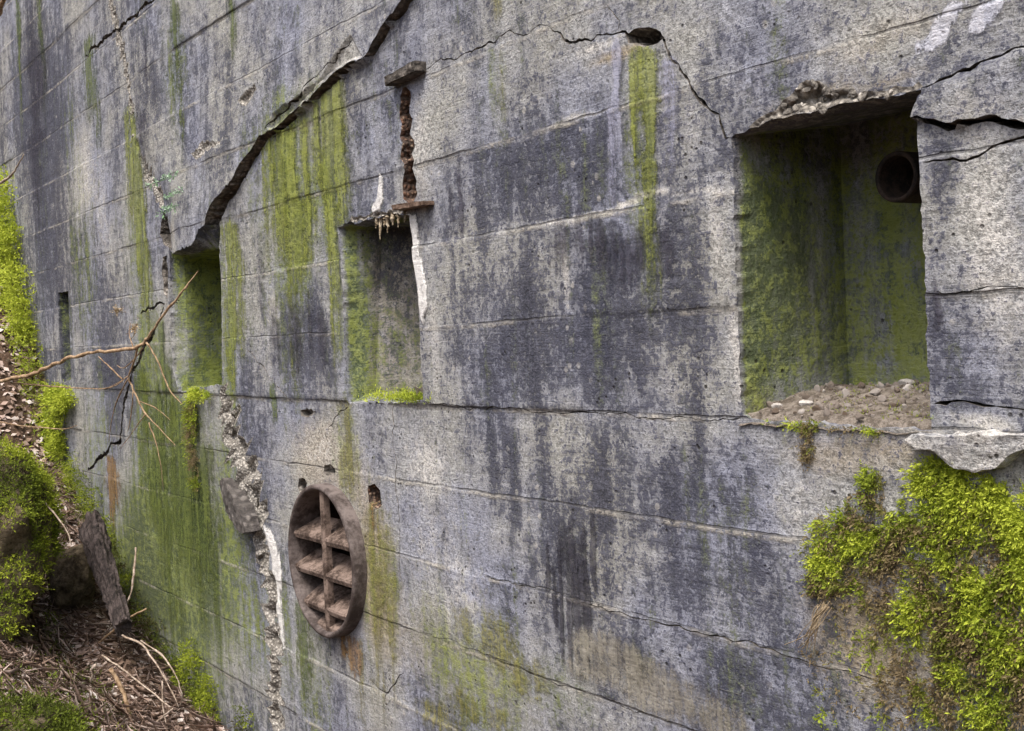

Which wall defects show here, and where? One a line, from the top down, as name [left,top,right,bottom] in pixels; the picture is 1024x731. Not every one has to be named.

crack [427,6,628,69]
spalling [625,27,666,47]
crack [204,0,413,225]
crack [664,41,730,139]
spalling [748,79,923,128]
crack [932,46,1024,85]
crack [916,114,1024,163]
peeling [902,429,1024,473]
spalling [368,484,382,509]
spalling [218,382,285,731]